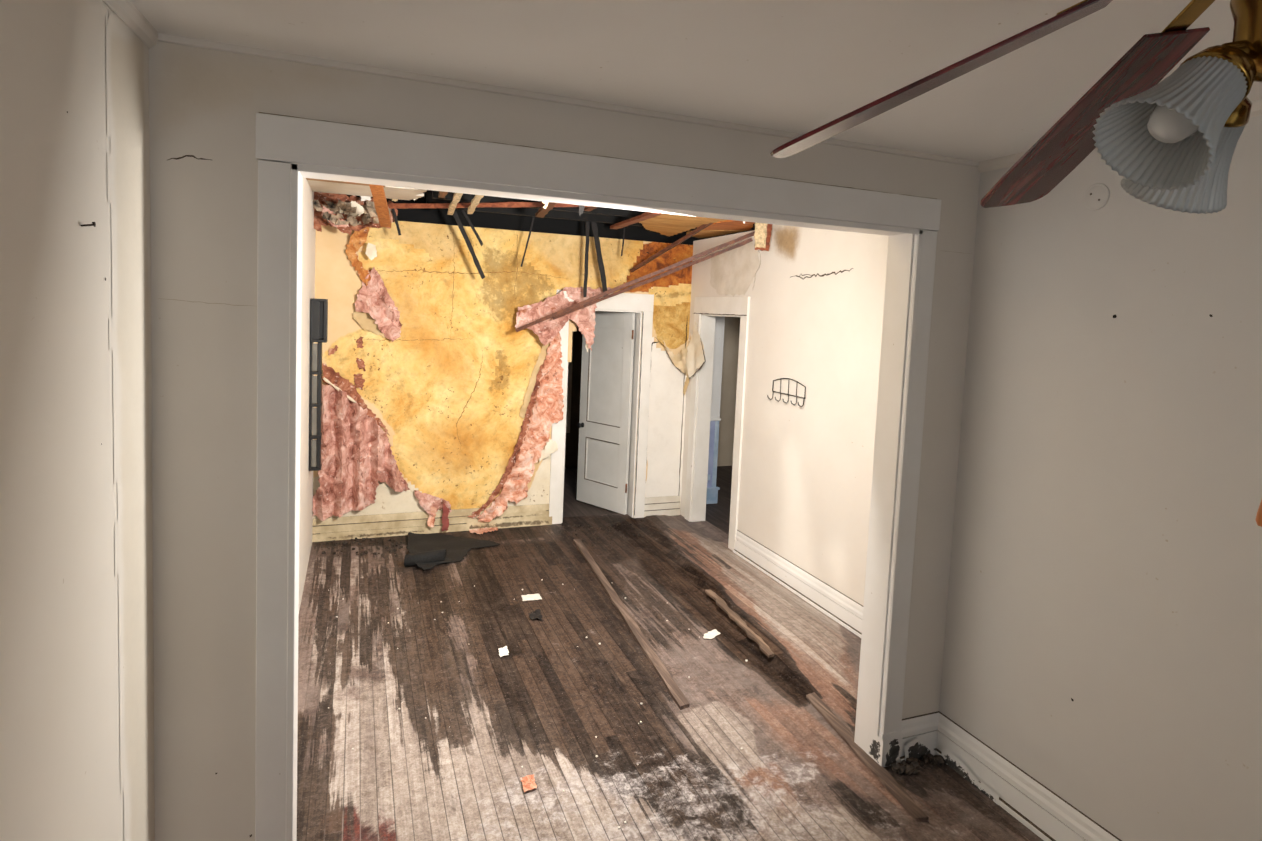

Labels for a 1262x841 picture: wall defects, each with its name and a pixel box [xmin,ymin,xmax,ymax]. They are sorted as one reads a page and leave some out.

crack [168,153,210,161]
peeling [365,243,377,260]
peeling [710,242,761,296]
peeling [353,337,366,390]
peeling [645,283,691,509]
peeling [313,479,442,528]
peeling [478,454,551,522]